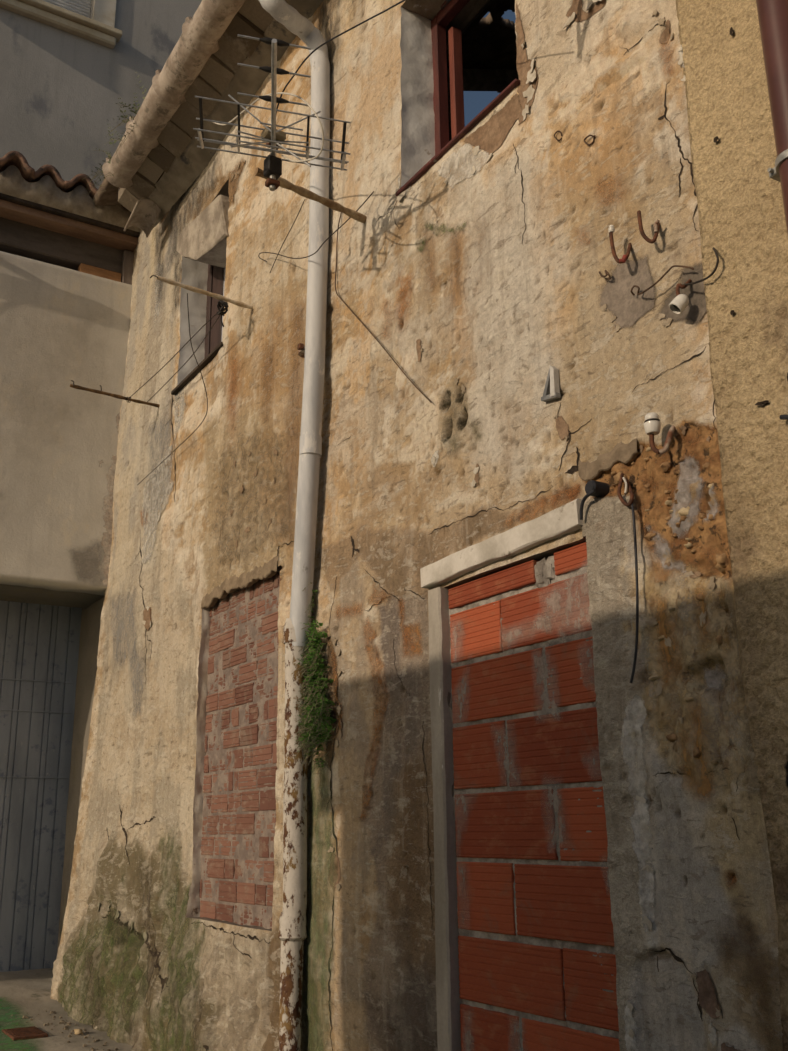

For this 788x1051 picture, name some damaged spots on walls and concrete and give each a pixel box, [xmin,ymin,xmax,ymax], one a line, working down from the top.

peeling [563,0,606,29]
peeling [438,3,538,187]
crack [658,82,698,231]
crack [632,347,706,392]
crack [427,405,589,535]
spalling [578,420,731,579]
crack [107,809,156,860]
peeling [621,695,655,933]
crack [102,915,169,1010]
crack [650,948,703,1021]
peeling [691,970,740,1051]